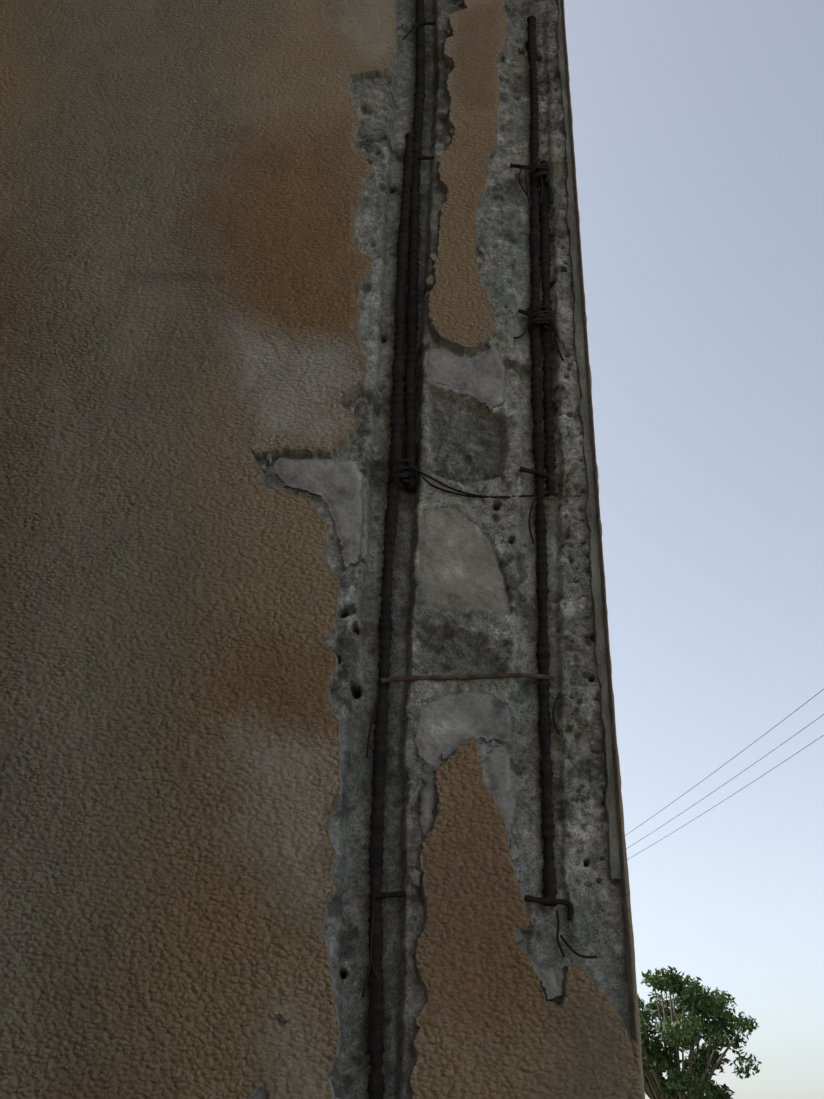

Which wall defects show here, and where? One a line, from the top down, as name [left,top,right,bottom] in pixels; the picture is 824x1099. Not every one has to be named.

spalling [248,0,637,1099]